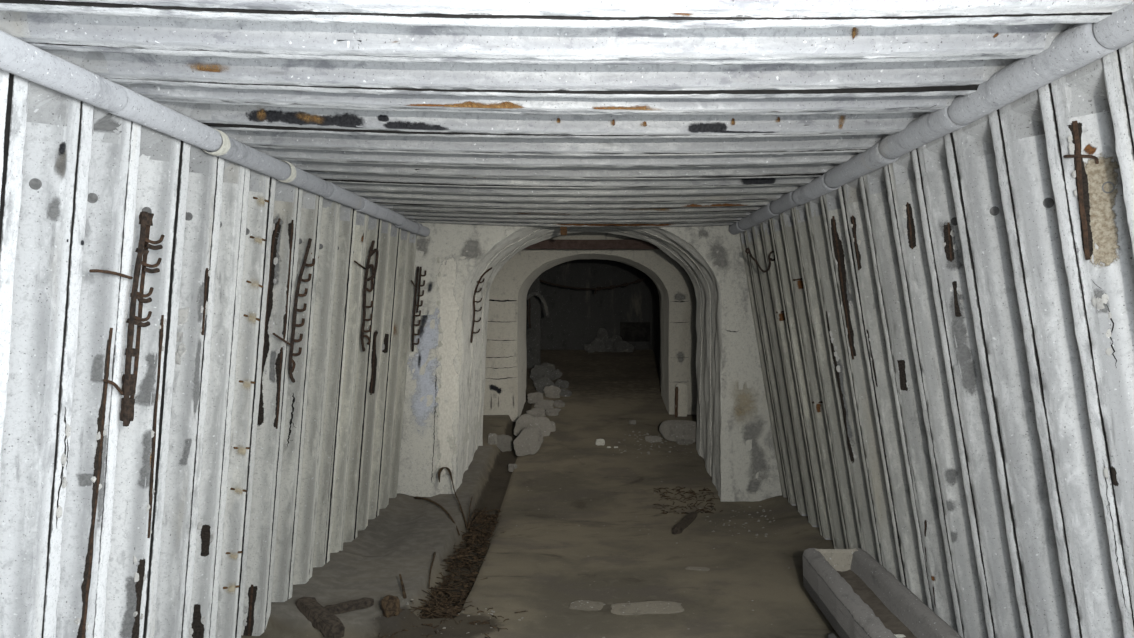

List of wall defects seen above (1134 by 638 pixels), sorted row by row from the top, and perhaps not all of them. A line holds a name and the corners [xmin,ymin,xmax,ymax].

corrosion [407,101,522,109]
spalling [1063,121,1120,266]
peeling [1092,282,1117,368]
leakage [744,421,765,491]